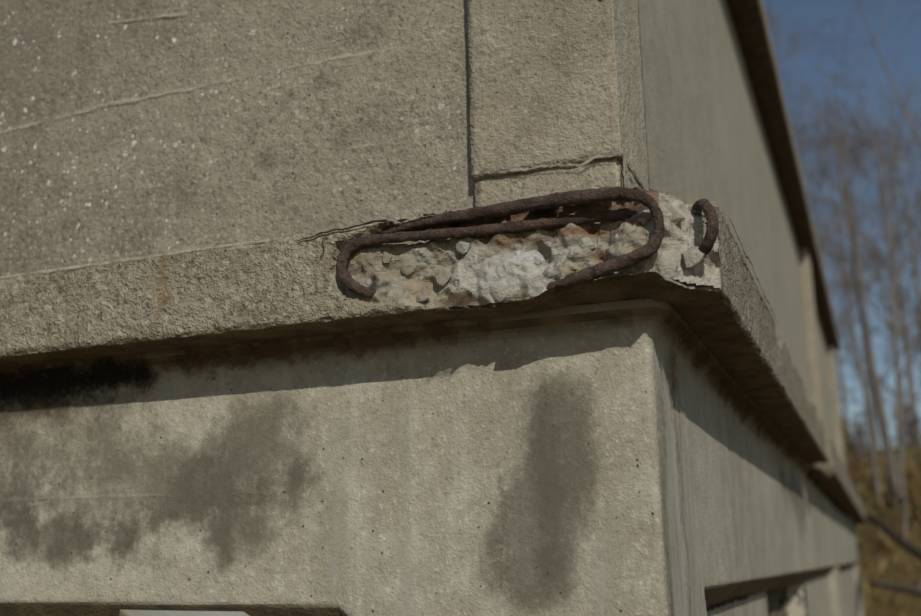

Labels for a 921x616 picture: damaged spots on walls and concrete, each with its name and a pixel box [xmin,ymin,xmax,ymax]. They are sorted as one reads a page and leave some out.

spalling [329,155,721,308]
damp [0,357,158,419]
spalling [807,448,836,479]